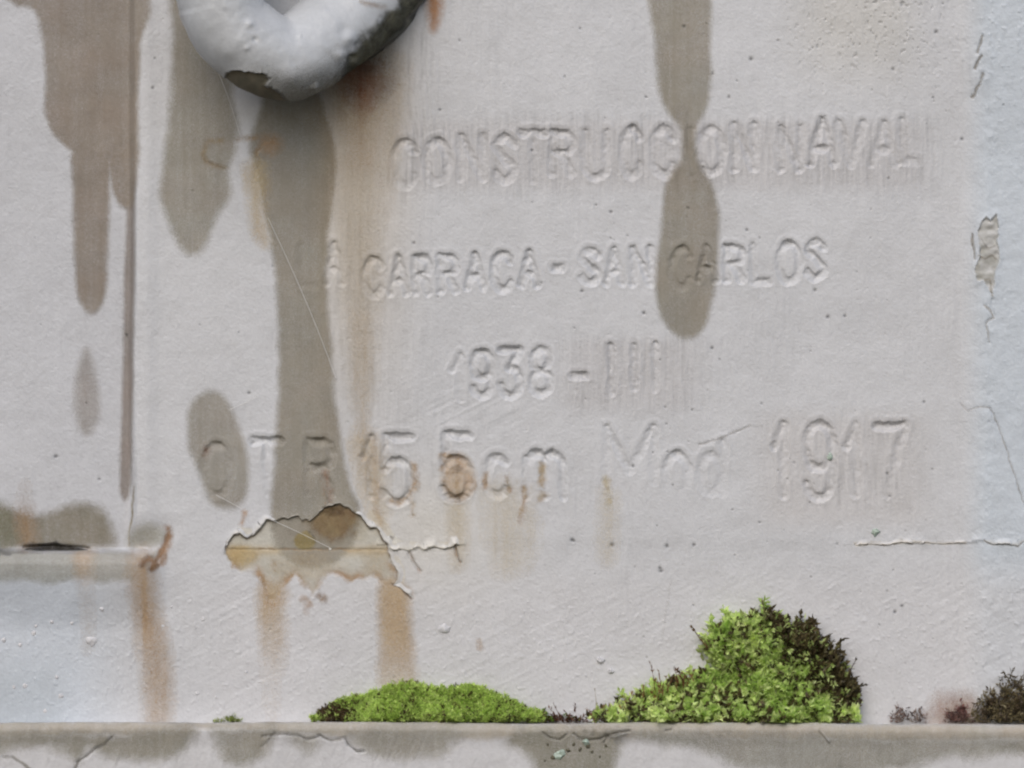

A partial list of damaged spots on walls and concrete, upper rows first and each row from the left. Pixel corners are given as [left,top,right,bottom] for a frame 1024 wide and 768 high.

crack [969,35,985,98]
damp [645,0,722,342]
damp [9,0,153,503]
damp [156,0,364,572]
peeling [970,214,1000,297]
crack [962,405,1024,502]
damp [0,499,170,586]
peeling [224,501,462,614]
corrosion [437,452,489,575]
crack [854,536,1024,547]
corrosion [121,524,179,722]
corrosion [373,575,422,688]